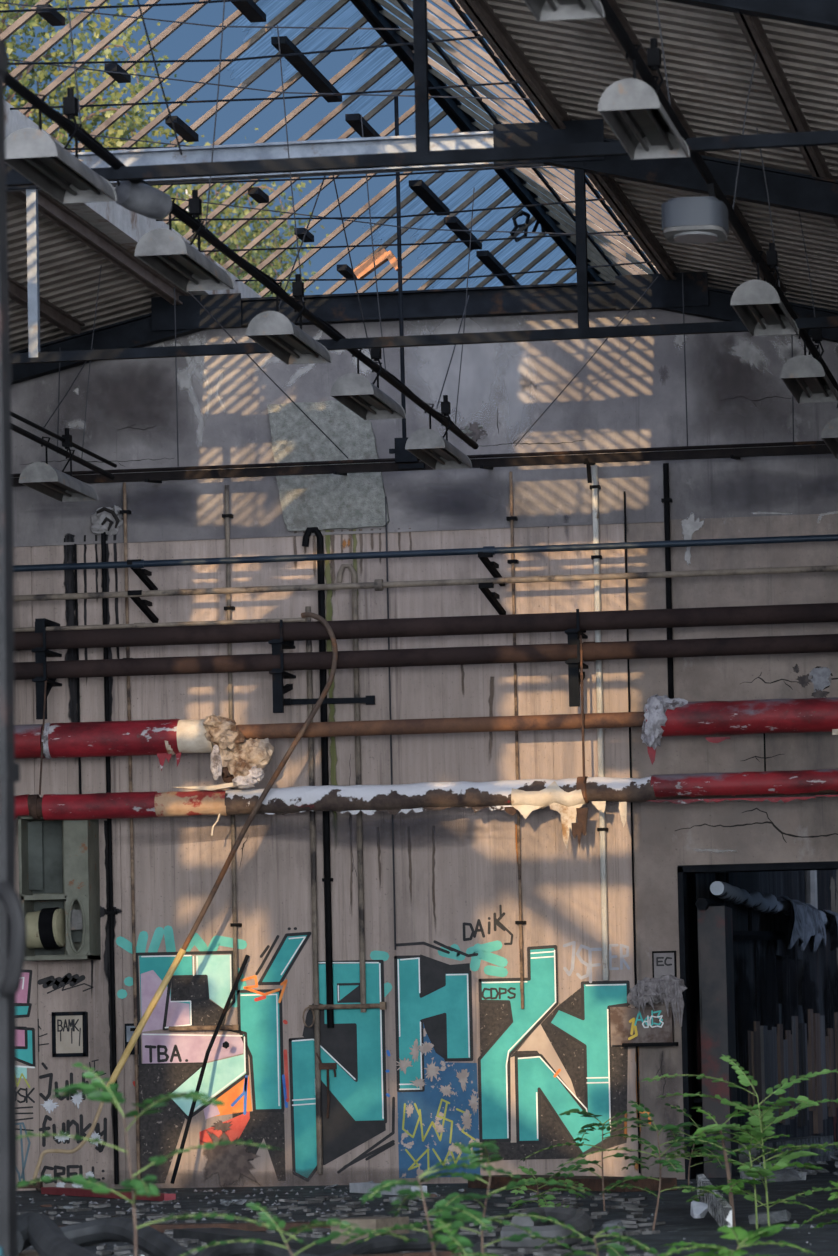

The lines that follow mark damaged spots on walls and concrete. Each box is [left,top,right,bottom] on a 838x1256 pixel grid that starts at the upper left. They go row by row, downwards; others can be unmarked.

spalling [793,664,838,698]
crack [675,808,838,843]